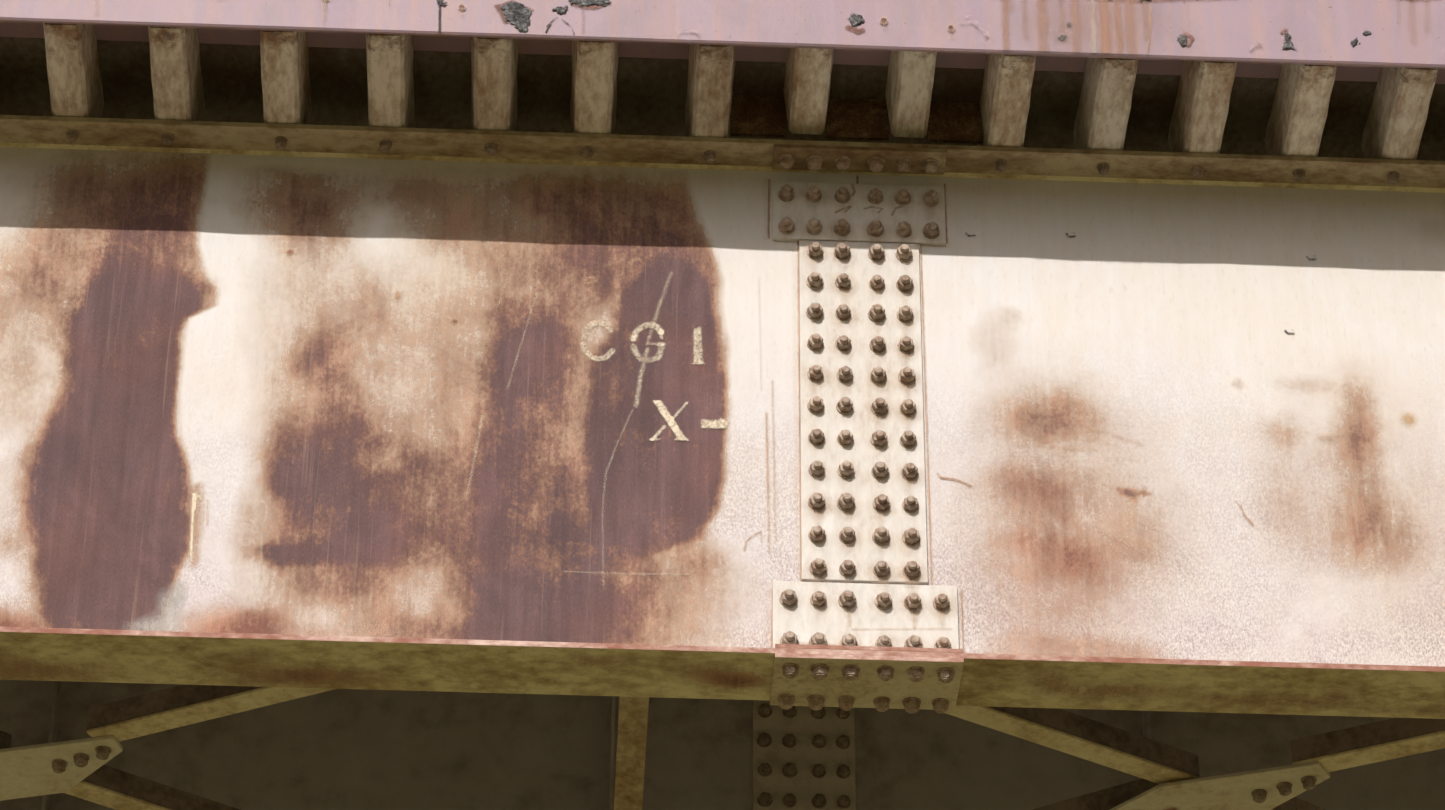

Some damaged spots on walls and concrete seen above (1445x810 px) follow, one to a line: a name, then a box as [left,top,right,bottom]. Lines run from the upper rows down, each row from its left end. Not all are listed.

spalling [495,0,611,34]
spalling [846,13,865,34]
spalling [1177,31,1194,46]
spalling [1280,28,1297,49]
rust [0,155,216,631]
rust [184,172,728,665]
rust [986,388,1159,659]
rust [246,653,362,685]
rust [684,667,765,689]